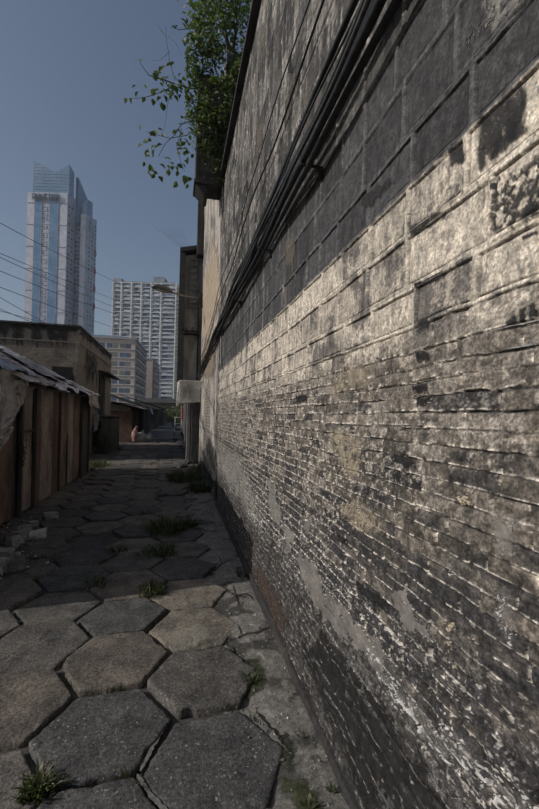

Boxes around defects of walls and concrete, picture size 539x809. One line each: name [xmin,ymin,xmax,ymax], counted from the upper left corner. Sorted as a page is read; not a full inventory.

peeling [466,0,519,44]
water stain [494,589,517,646]
crack [256,710,290,753]
water stain [302,629,539,809]
crack [137,724,168,809]
water stain [278,776,319,809]